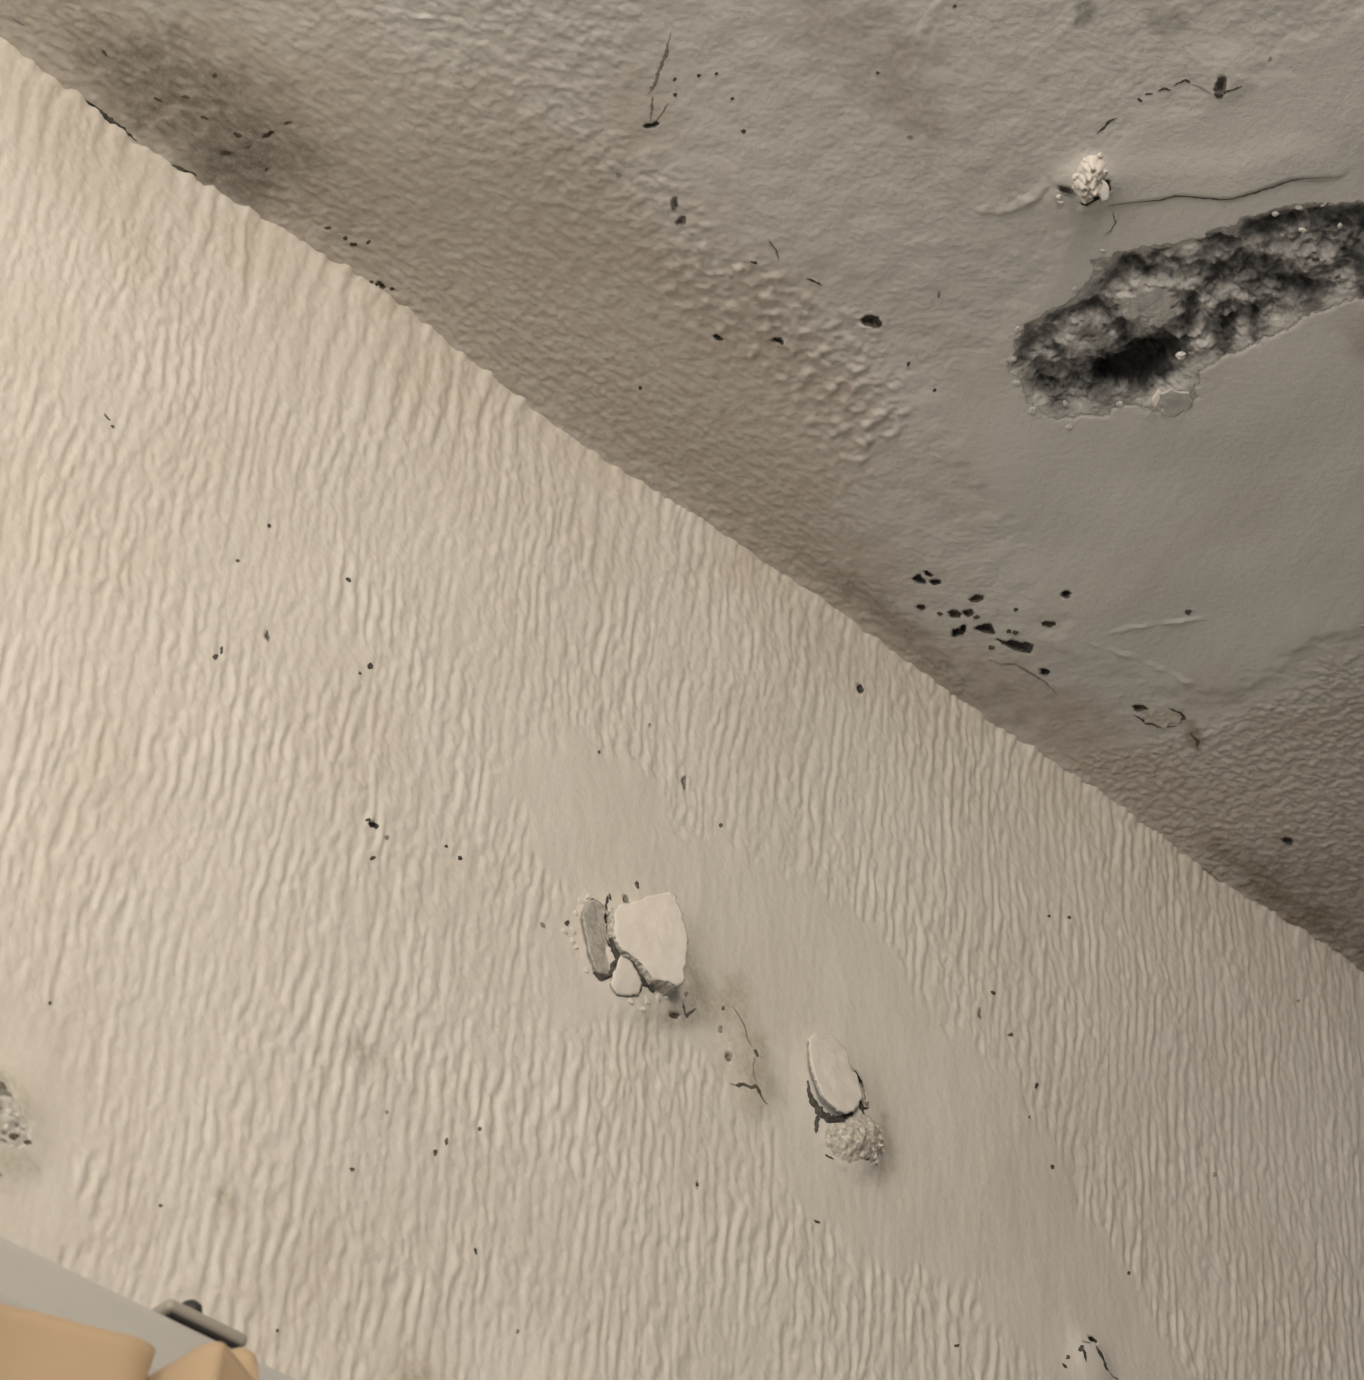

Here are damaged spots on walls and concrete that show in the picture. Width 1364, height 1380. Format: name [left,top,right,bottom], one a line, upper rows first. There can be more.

flaking render [1007,153,1364,430]
spalling [912,570,940,585]
spalling [917,594,1033,653]
crack [717,1005,767,1104]
crack [1062,1336,1119,1380]